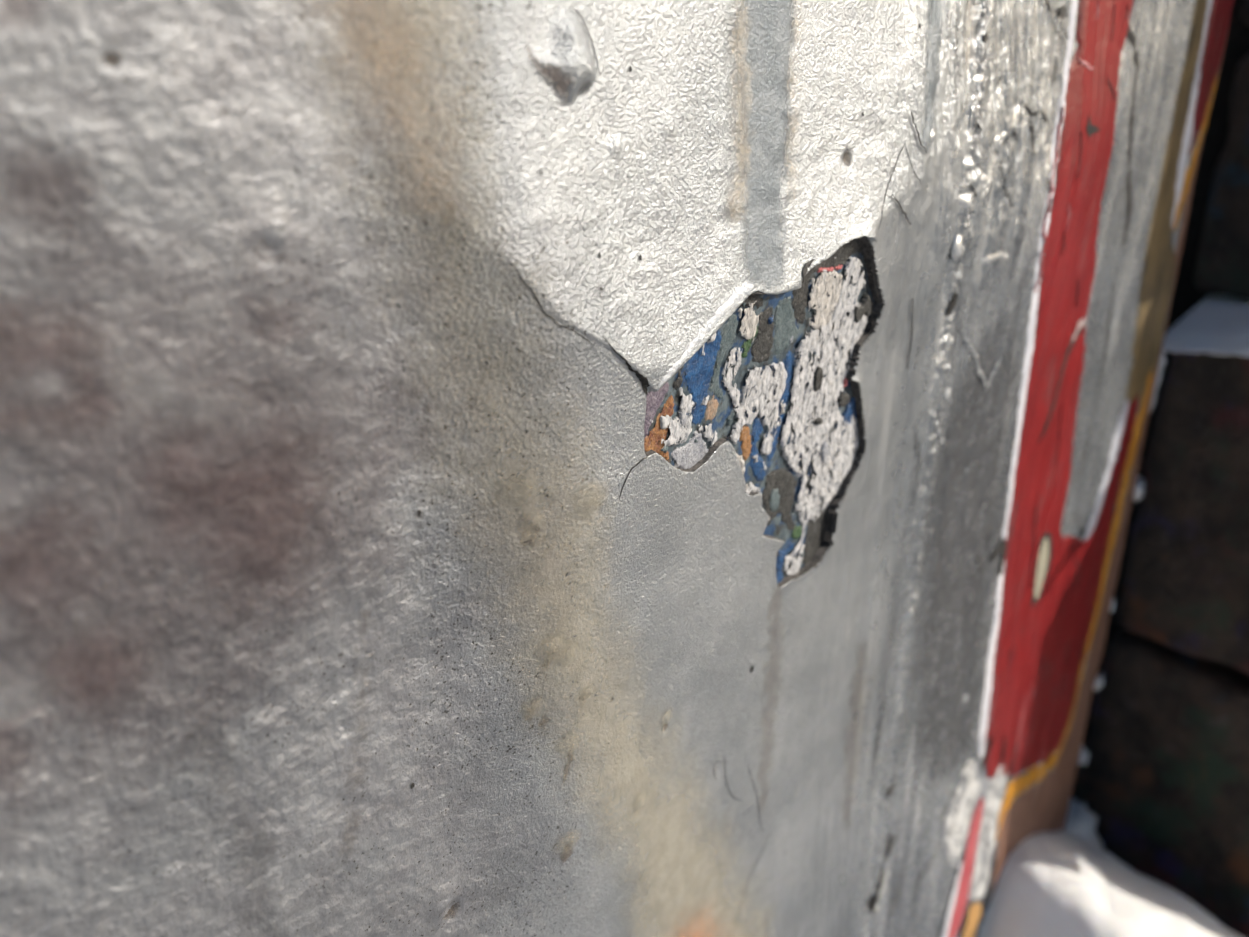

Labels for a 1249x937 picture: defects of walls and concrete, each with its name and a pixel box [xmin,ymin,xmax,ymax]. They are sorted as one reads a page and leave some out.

leakage [738,0,794,287]
crack [495,238,650,395]
spalling [644,236,881,584]